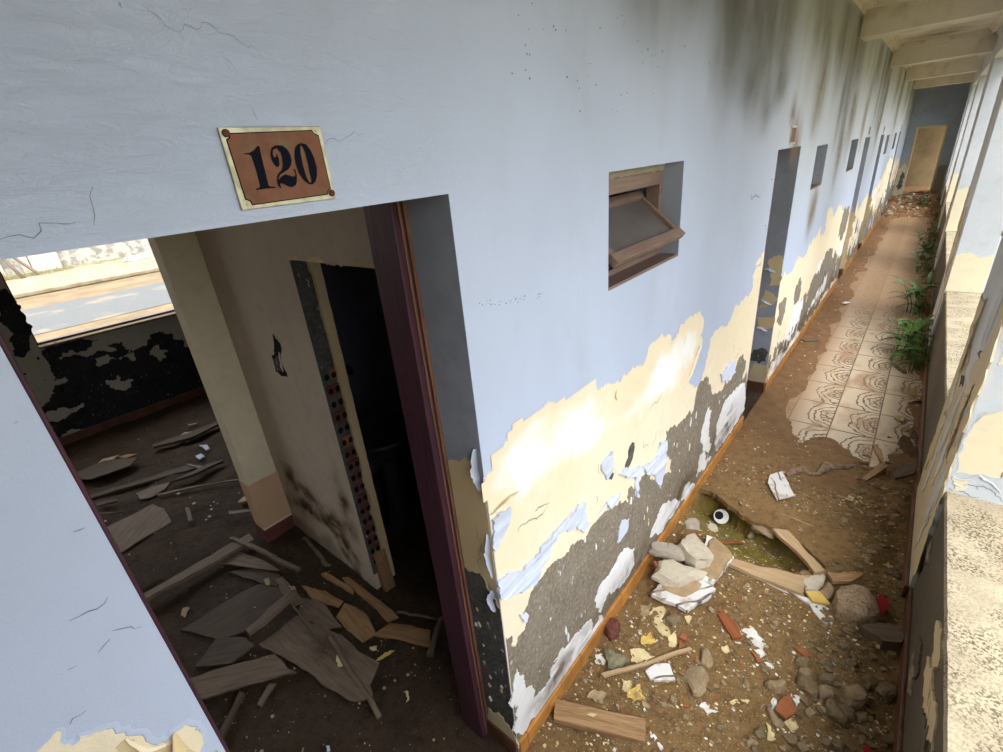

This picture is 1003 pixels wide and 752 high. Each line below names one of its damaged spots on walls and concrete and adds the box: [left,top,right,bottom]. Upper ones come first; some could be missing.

crack [1,187,95,239]
peeling [105,375,133,391]
peeling [149,345,168,361]
peeling [910,154,1003,580]
peeling [45,403,84,422]
peeling [447,154,907,751]
water stain [285,468,360,575]
peeling [906,620,944,752]
peeling [31,719,218,752]